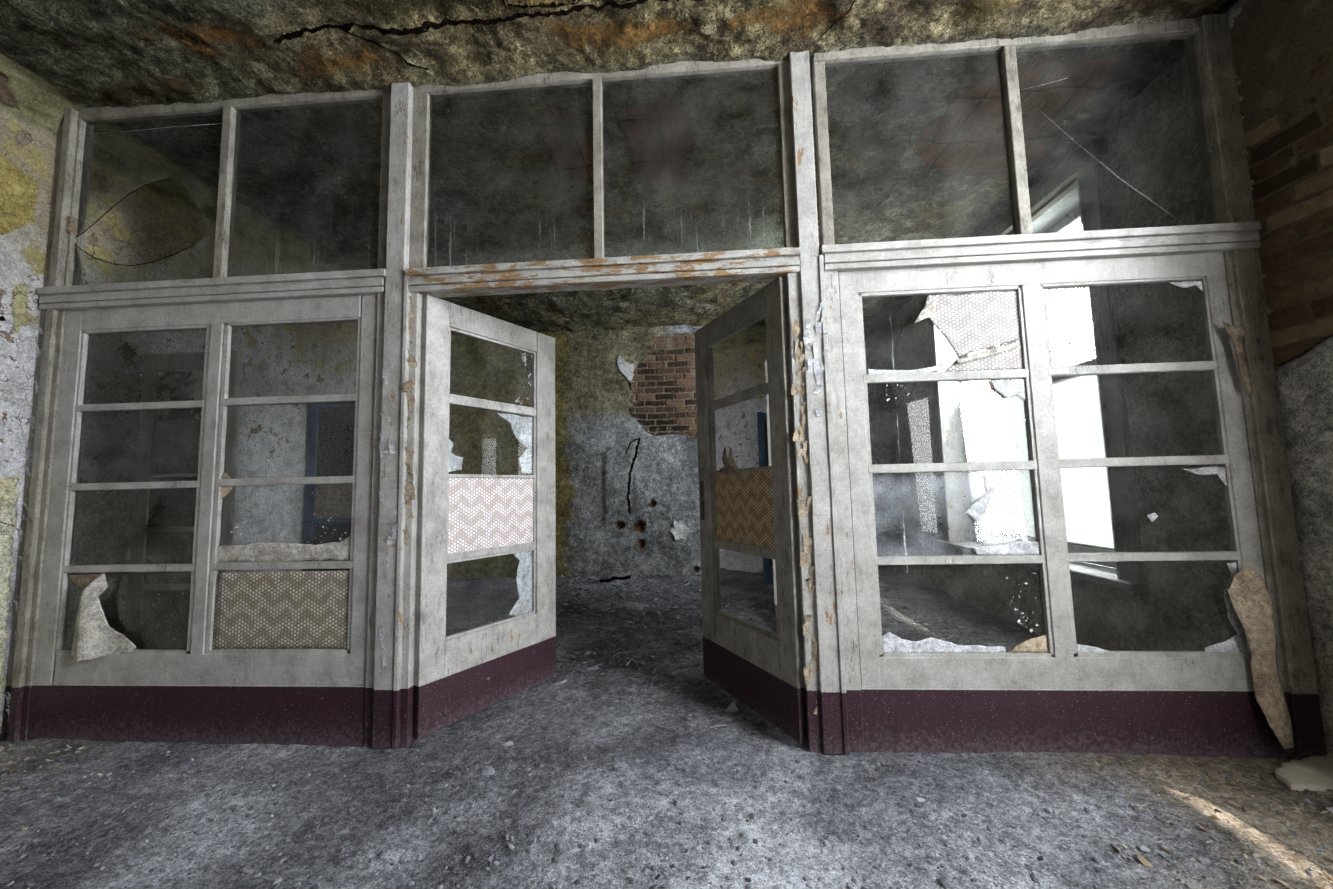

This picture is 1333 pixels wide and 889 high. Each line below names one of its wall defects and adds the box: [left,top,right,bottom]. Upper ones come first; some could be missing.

crack [274,0,704,71]
spalling [502,0,584,9]
crack [819,0,855,40]
peeling [0,155,40,235]
flaking render [1174,0,1333,377]
peeling [0,284,43,357]
flaking render [617,332,697,438]
peeling [1222,321,1253,394]
peeling [16,381,39,540]
crack [625,437,641,514]